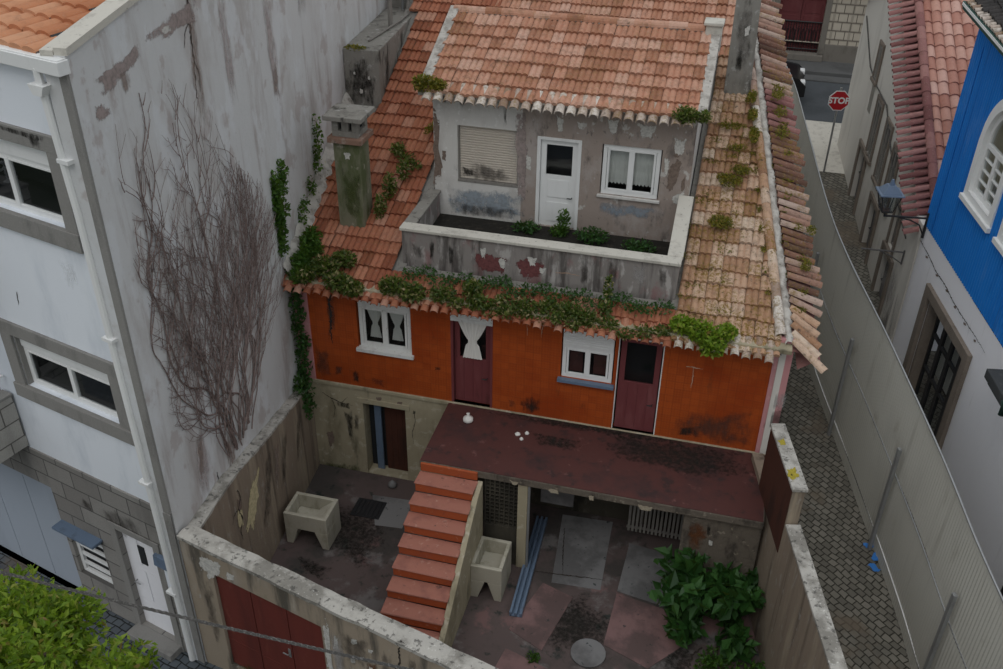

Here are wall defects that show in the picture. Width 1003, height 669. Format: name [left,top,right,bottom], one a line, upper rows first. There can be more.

peeling [148,0,195,38]
peeling [99,46,138,94]
crack [184,0,203,99]
peeling [96,105,110,120]
peeling [664,135,686,204]
peeling [475,248,546,279]
water stain [511,400,735,476]